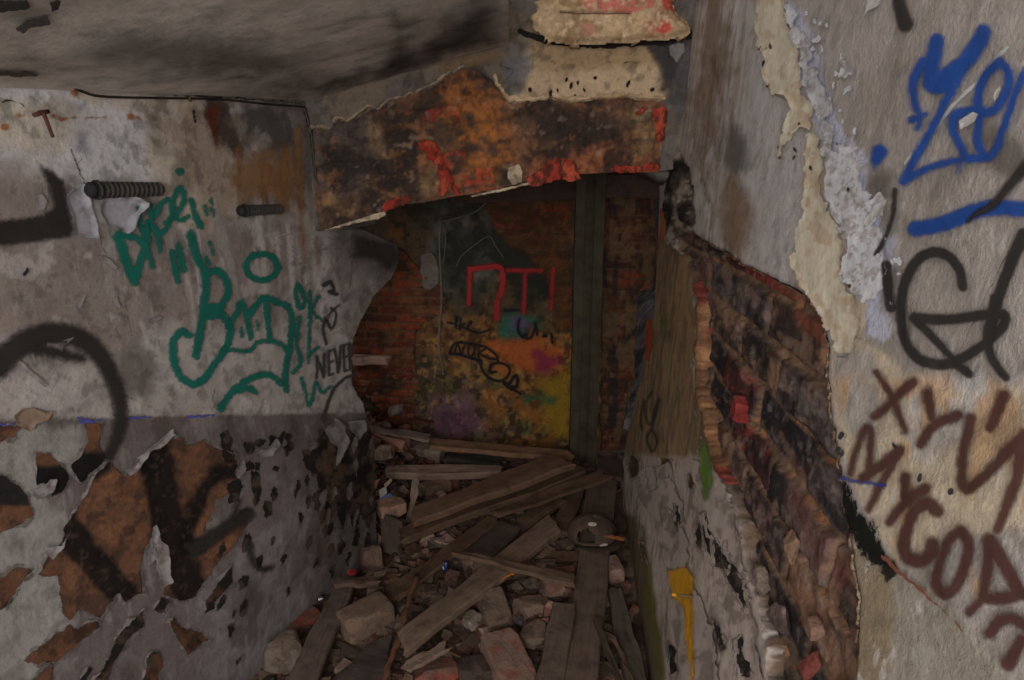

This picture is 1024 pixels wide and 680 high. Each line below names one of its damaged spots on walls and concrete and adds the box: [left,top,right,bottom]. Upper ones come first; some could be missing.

damp [205,96,292,158]
peeling [67,184,150,240]
spalling [308,0,902,680]
peeling [0,408,53,444]
peeling [0,418,377,680]